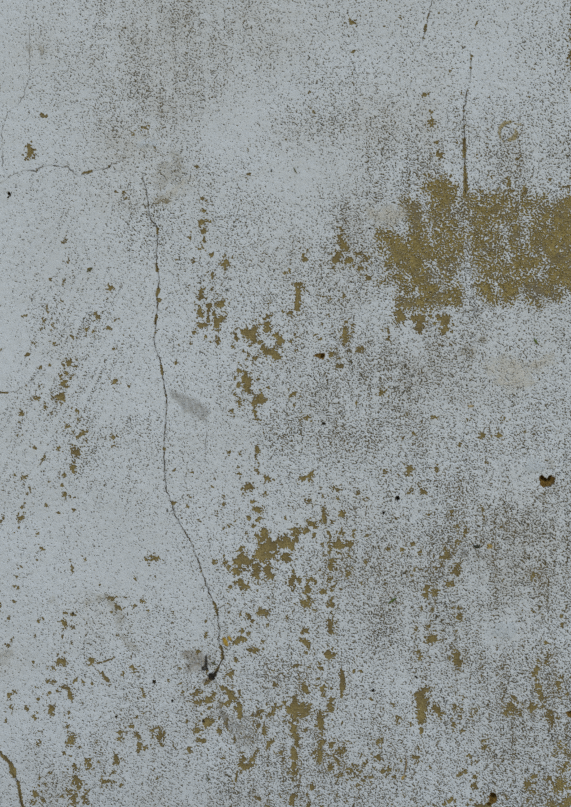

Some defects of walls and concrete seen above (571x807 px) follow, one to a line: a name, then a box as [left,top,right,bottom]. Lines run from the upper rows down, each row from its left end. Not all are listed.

peeling [186,195,308,434]
peeling [313,313,368,371]
peeling [328,140,571,346]
peeling [30,357,90,514]
crack [142,175,224,683]
crack [0,751,26,807]
peeling [4,609,124,807]
peeling [99,584,150,614]
peeling [115,442,480,807]
peeling [417,736,492,807]
peeling [500,638,571,731]
peeling [523,740,571,807]